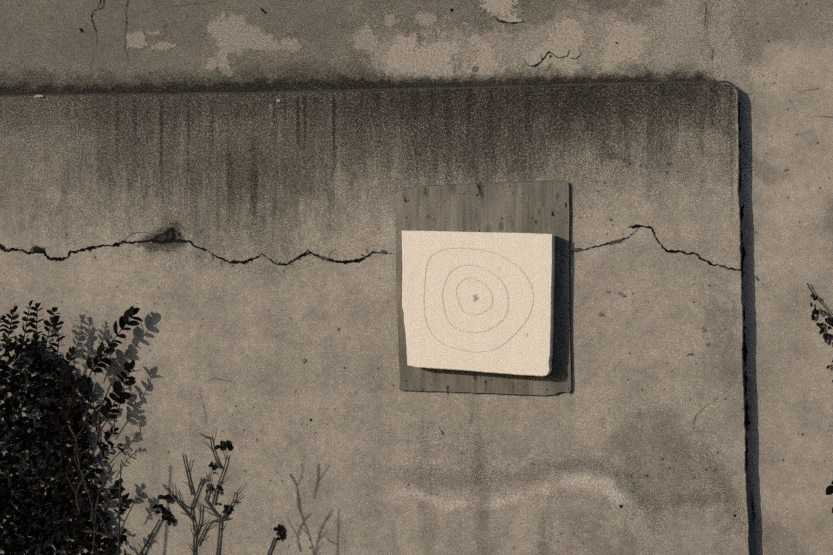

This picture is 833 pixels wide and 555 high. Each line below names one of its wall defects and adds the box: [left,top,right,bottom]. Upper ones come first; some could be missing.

crack [89,0,104,78]
peeling [206,13,302,77]
peeling [351,0,753,125]
crack [3,223,394,267]
crack [571,95,755,528]